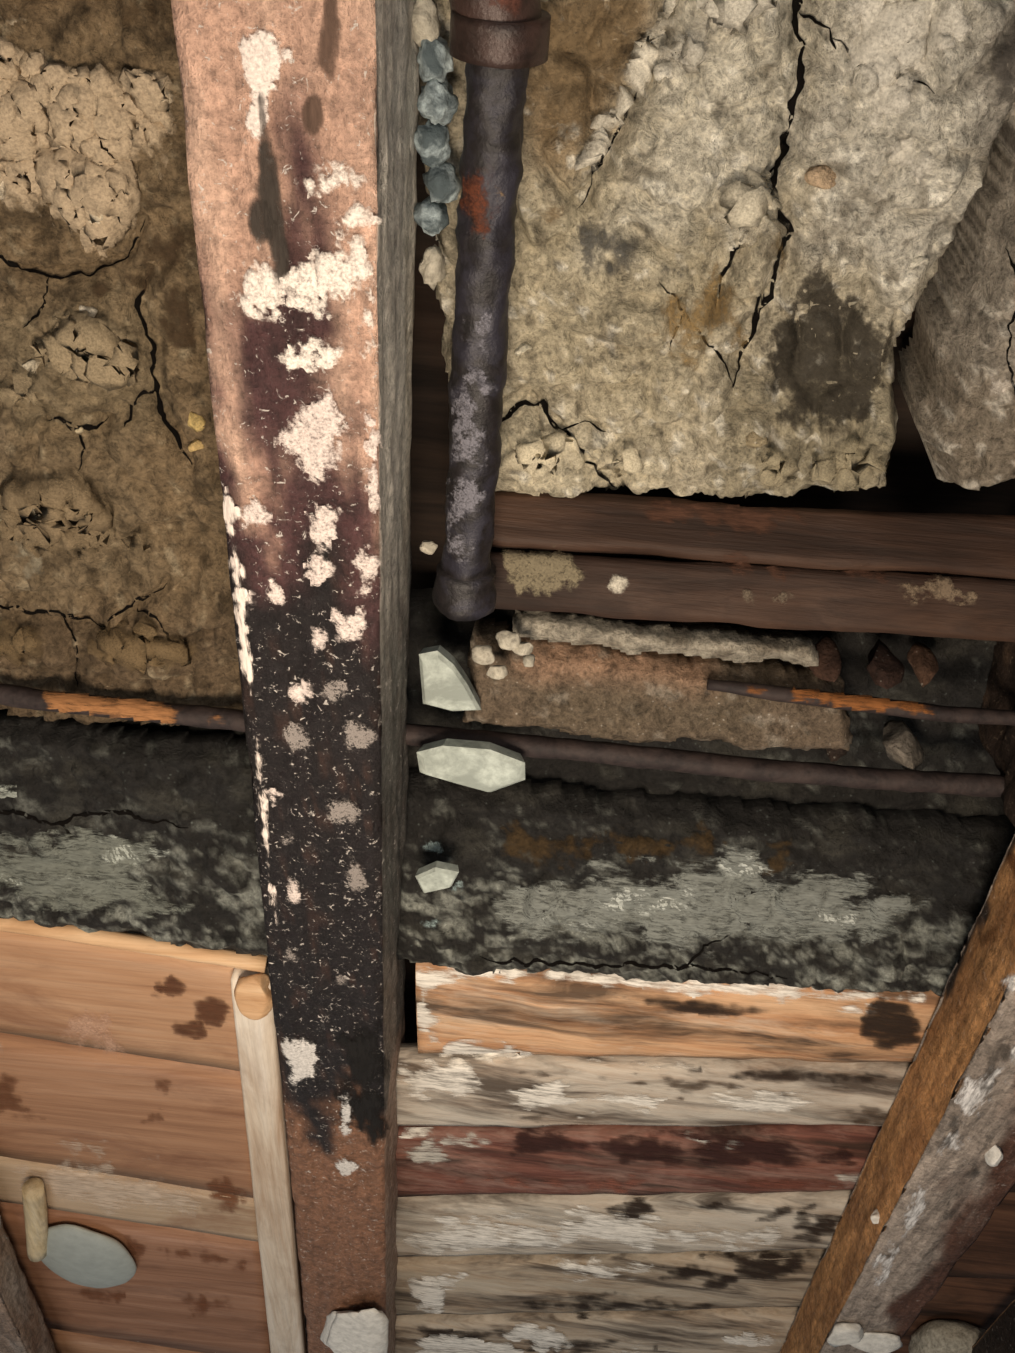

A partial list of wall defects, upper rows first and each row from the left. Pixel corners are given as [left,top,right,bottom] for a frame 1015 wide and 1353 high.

damp [248,96,289,282]
rust [459,176,490,233]
crack [658,0,935,388]
crack [0,221,193,471]
crack [1006,311,1015,394]
rust [43,691,175,724]
rust [792,688,933,715]
damp [0,826,194,920]
damp [493,822,926,953]
peeling [398,968,532,1100]
peeling [547,970,876,1013]
peeling [403,1205,780,1281]